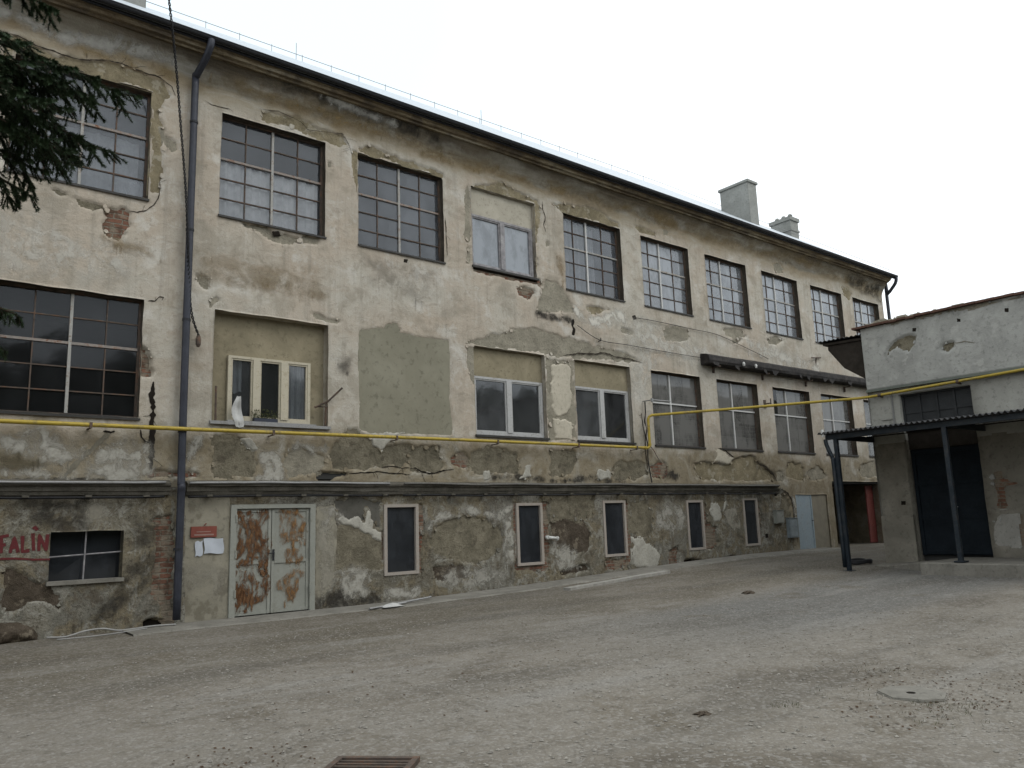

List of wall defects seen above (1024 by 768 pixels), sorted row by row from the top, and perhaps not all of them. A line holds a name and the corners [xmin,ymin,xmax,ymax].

flaking render [39,182,130,241]
spalling [463,187,703,481]
spalling [866,294,1024,359]
crack [140,382,162,469]
spalling [0,426,531,482]
flaking render [713,449,733,465]
corrosion [235,509,306,614]
spalling [324,497,383,546]
spalling [604,500,695,571]